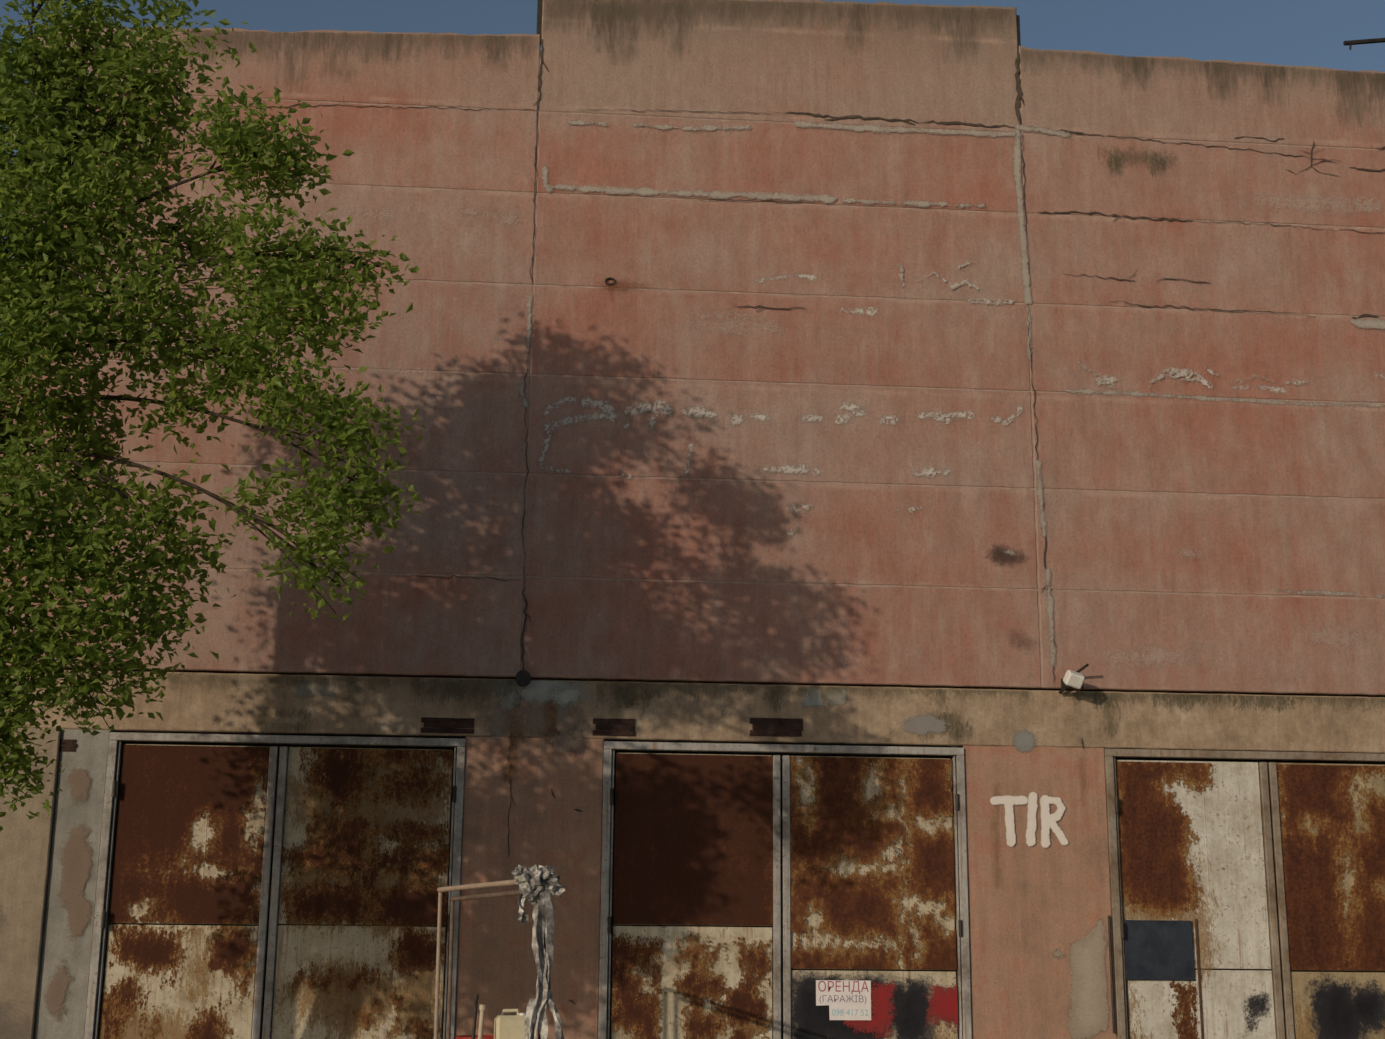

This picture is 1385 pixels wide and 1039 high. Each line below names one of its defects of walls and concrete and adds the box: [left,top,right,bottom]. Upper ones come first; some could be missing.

peeling [541,166,985,208]
crack [578,52,1385,460]
peeling [517,382,771,474]
peeling [799,401,1024,426]
peeling [1066,361,1384,407]
crack [1041,502,1049,591]
rust [99,745,270,1039]
rust [611,753,773,1039]
rust [790,756,957,970]
flaking render [1054,919,1110,1039]
rust [1116,761,1218,1039]
rust [1276,764,1385,971]